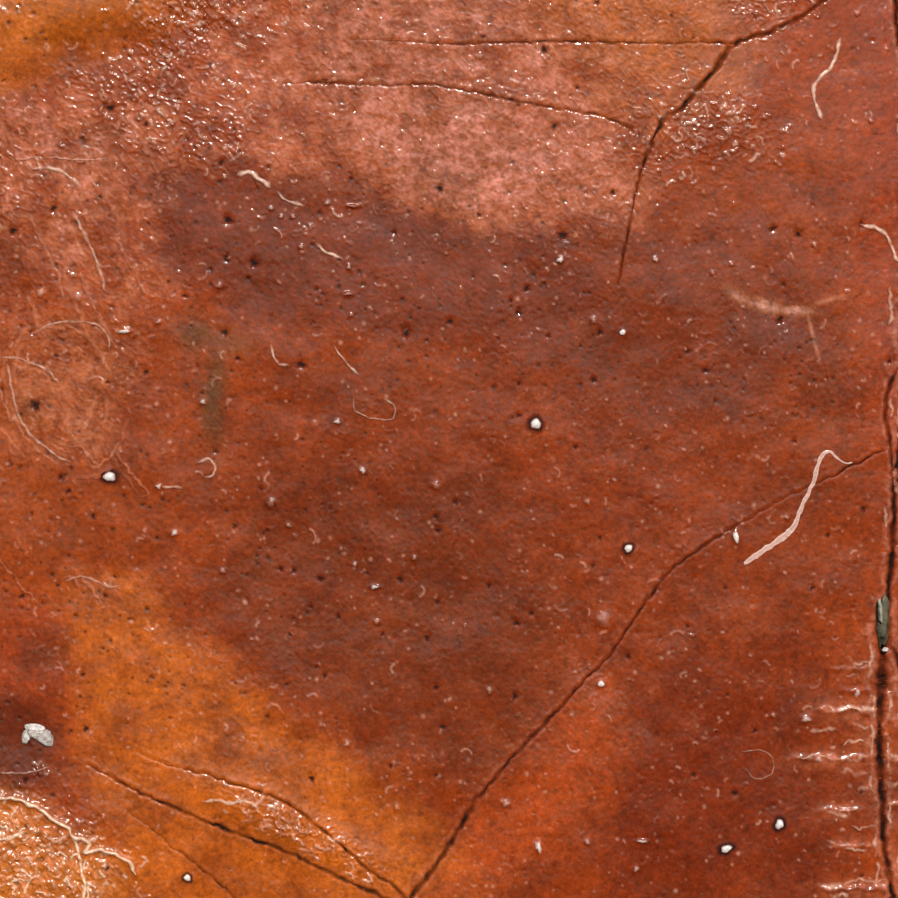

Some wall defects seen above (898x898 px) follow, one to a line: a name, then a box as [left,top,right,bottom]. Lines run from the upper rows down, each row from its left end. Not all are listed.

crack [284,0,829,285]
corrosion [602,0,794,174]
crack [890,0,898,47]
crack [887,287,898,325]
corrosion [40,552,654,898]
crack [88,368,898,898]